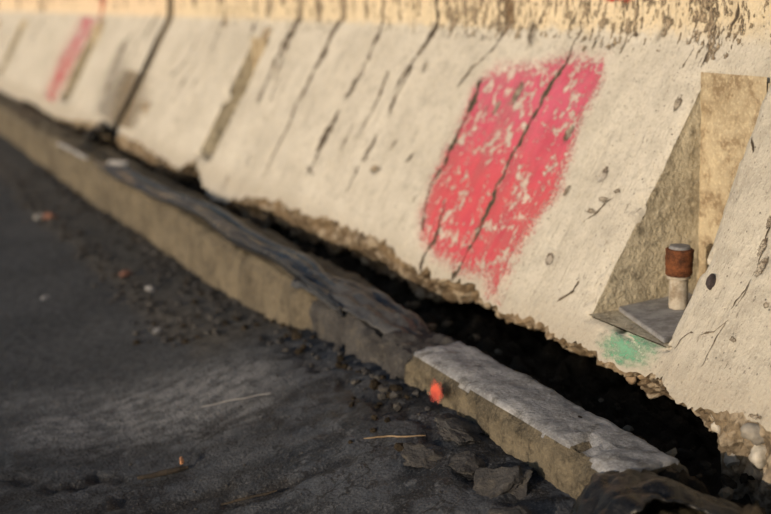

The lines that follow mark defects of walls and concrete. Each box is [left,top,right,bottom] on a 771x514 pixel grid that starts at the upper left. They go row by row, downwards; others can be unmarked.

crack [412,30,505,272]
peeling [218,0,769,65]
crack [451,15,577,281]
spalling [755,215,771,277]